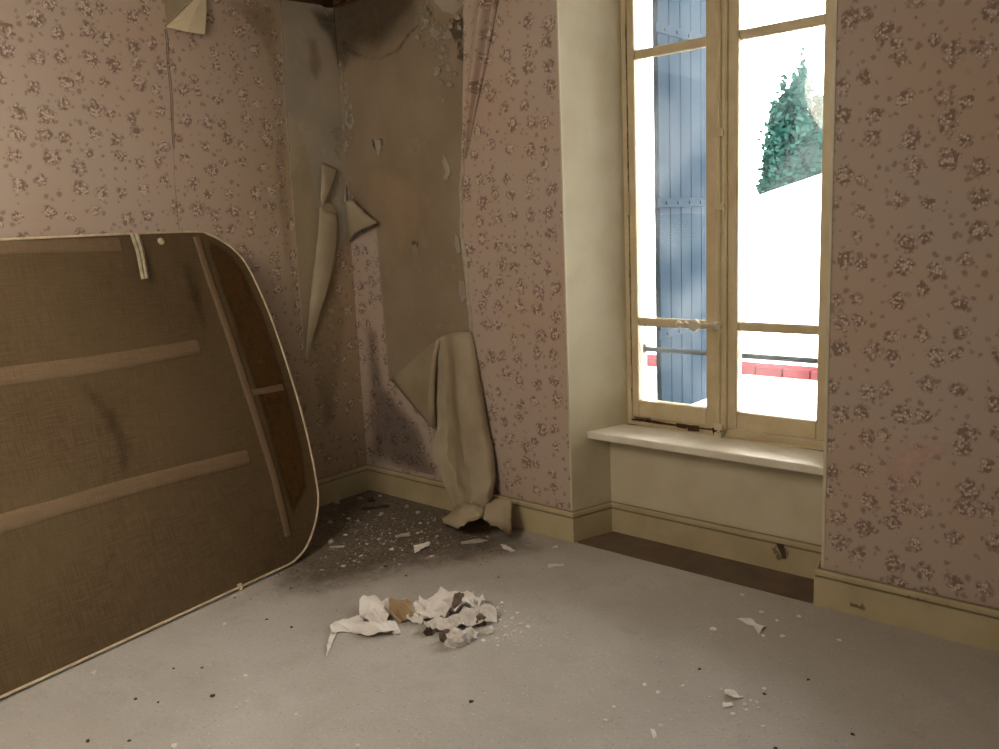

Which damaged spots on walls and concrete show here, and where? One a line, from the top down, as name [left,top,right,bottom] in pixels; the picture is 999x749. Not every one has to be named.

peeling [279,0,473,381]